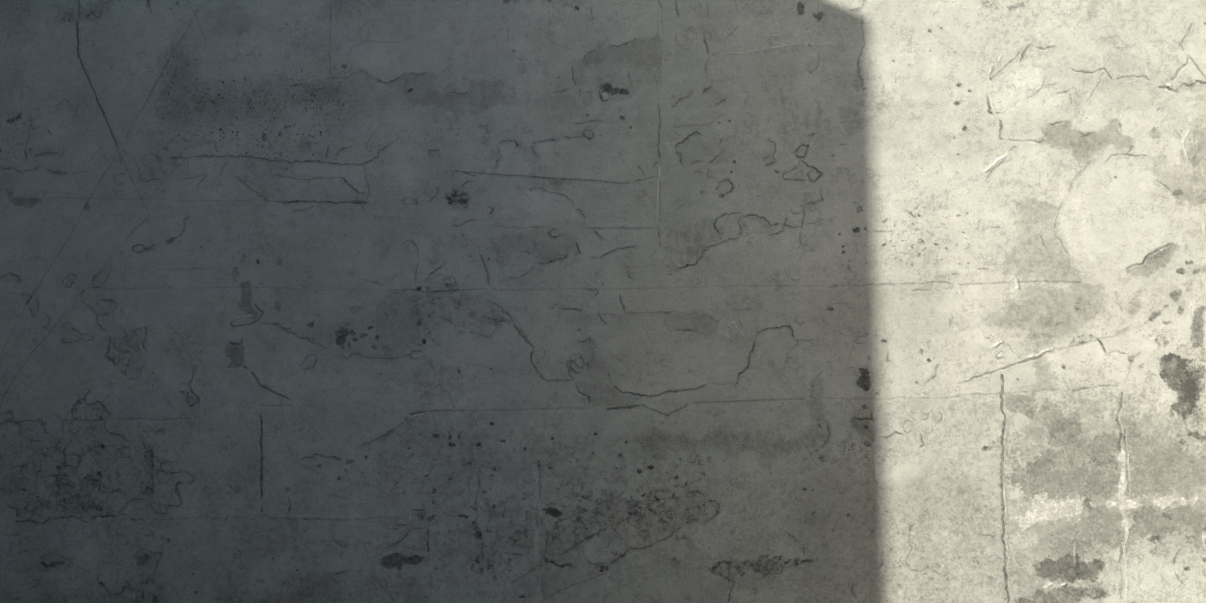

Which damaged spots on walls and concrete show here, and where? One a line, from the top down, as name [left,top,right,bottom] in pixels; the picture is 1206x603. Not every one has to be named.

crack [76,23,117,145]
crack [736,325,794,384]
crack [971,348,1052,603]
water stain [1038,554,1104,595]